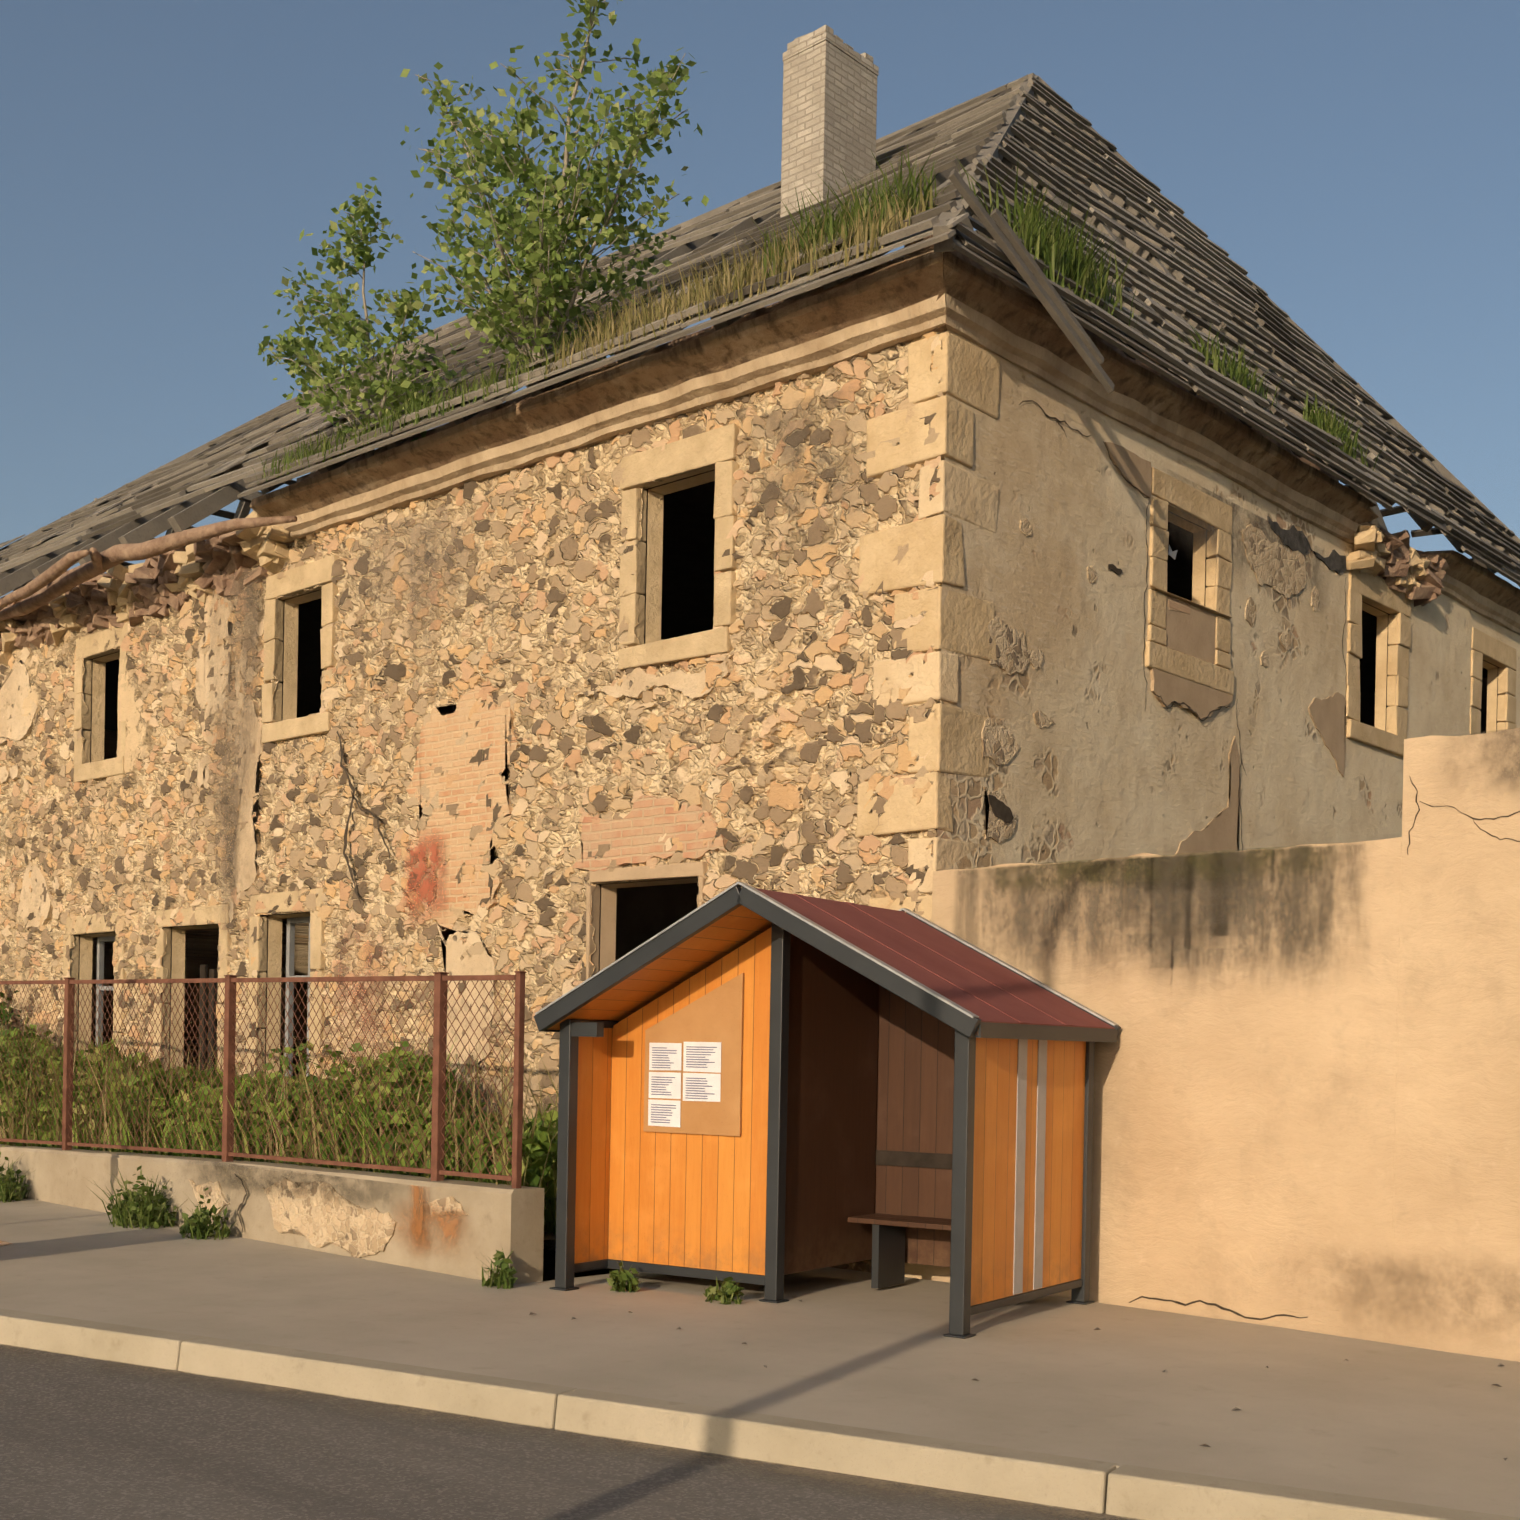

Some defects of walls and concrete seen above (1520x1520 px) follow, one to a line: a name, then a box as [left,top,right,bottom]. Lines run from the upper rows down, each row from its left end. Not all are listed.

spalling [1240,515,1449,627]
spalling [987,617,1043,675]
crack [1019,400,1247,851]
flaking render [1150,668,1234,719]
flaking render [1308,692,1346,777]
spalling [983,787,1016,843]
flaking render [1174,736,1241,856]
crack [1407,778,1520,855]
damp [986,846,1332,960]
spalling [188,1179,230,1215]
spalling [262,1177,397,1258]
corrosion [408,1186,459,1242]